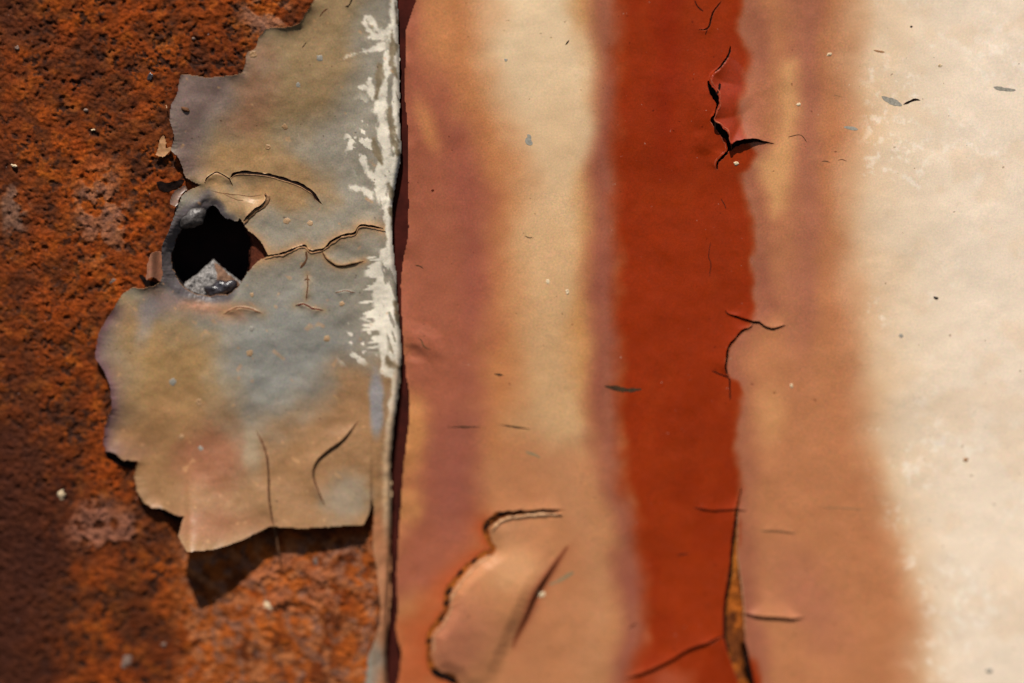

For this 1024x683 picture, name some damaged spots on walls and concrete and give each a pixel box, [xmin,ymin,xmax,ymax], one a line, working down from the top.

crack [707,46,807,170]
rust [2,188,23,233]
rust [75,174,127,244]
crack [157,170,323,224]
peeling [102,0,401,540]
crack [265,224,383,310]
rust [396,0,916,683]
crack [713,310,785,399]
crack [312,422,358,507]
rust [68,502,135,549]
peeling [426,509,574,683]